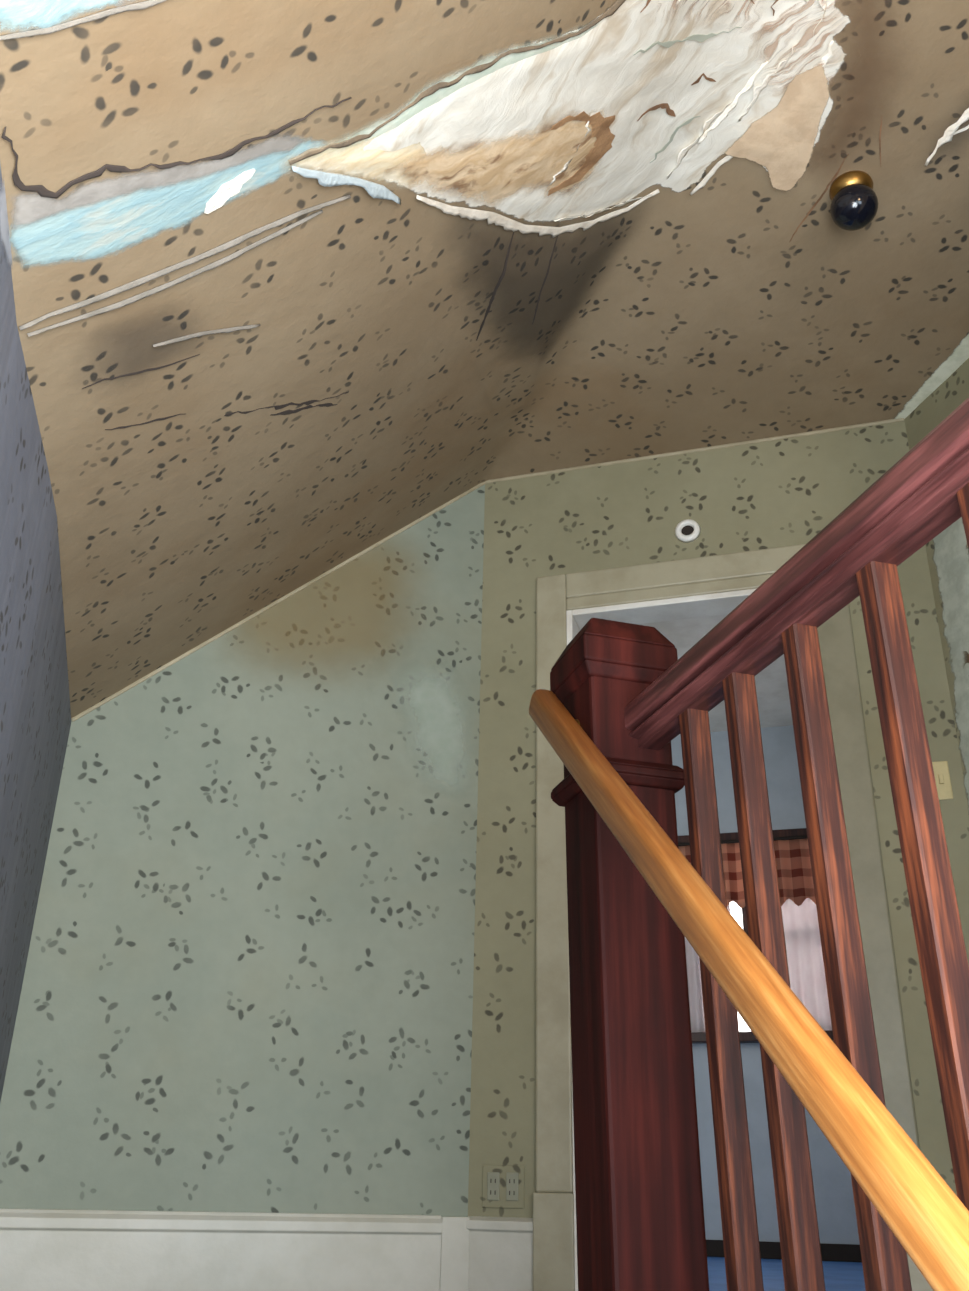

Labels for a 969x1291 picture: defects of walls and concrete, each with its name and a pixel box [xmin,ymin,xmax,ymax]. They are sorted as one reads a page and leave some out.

flaking render [288,0,850,238]